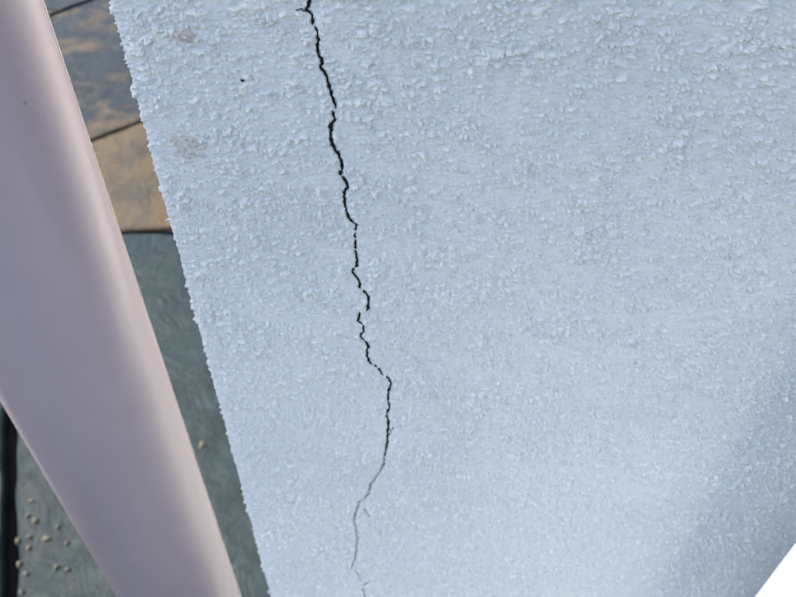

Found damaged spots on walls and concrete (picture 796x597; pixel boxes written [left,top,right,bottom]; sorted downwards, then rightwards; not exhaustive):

crack [297,0,393,597]